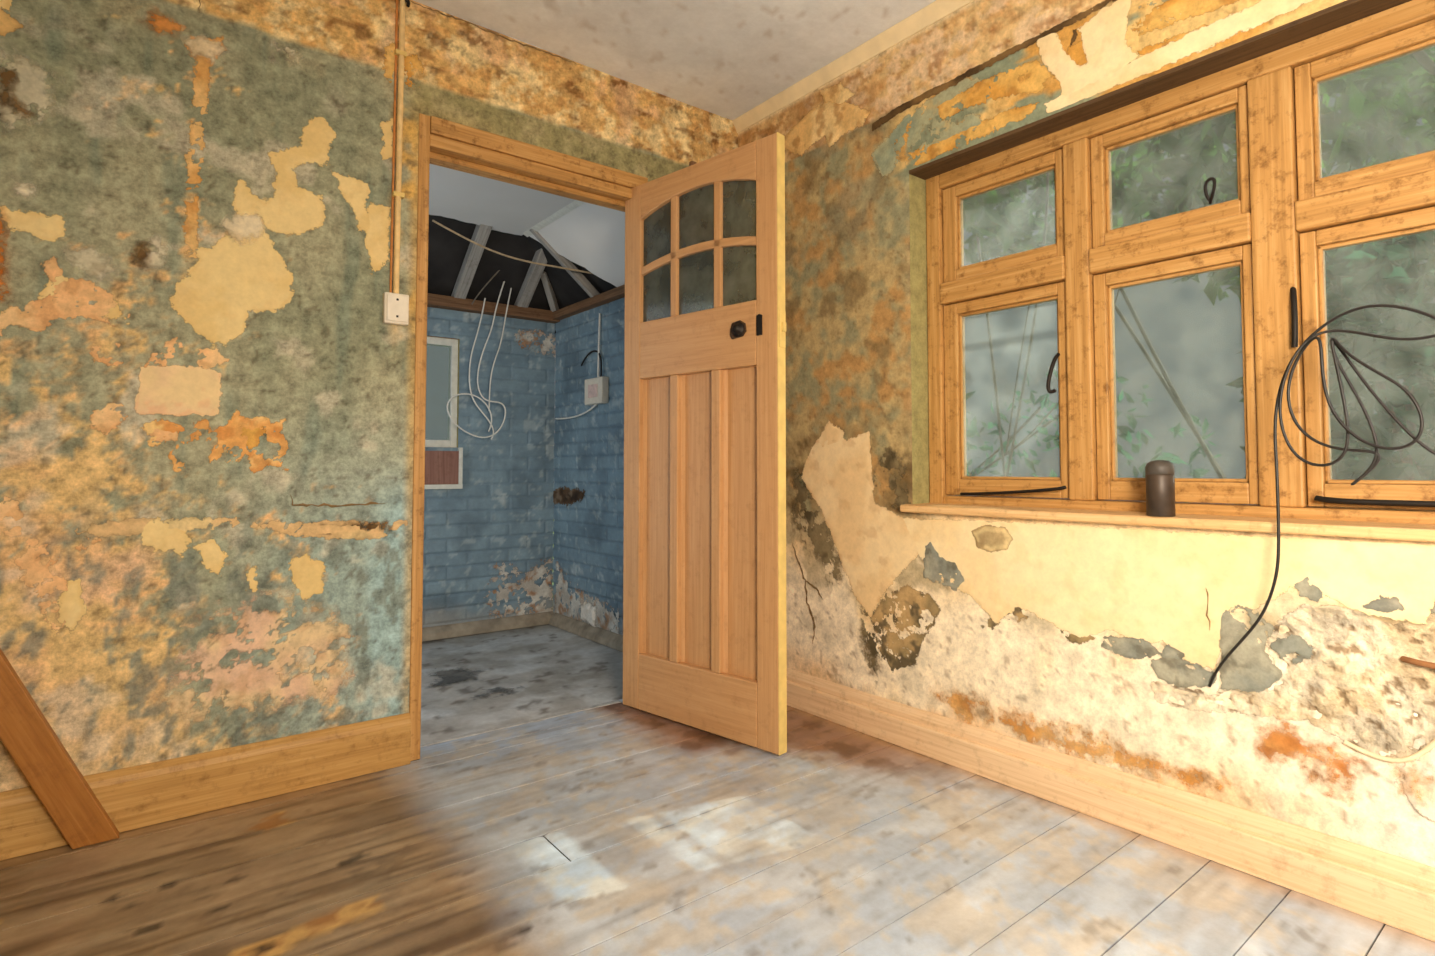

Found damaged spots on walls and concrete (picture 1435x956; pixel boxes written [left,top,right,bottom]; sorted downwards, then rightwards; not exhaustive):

peeling [1067,40,1087,66]
peeling [1132,0,1240,55]
peeling [871,60,1055,178]
peeling [0,206,130,336]
peeling [90,116,391,473]
peeling [141,516,228,575]
peeling [167,553,354,725]
peeling [484,556,621,634]
peeling [871,542,964,671]
peeling [971,525,1013,553]
peeling [981,607,1028,630]
flaking render [1060,577,1435,763]